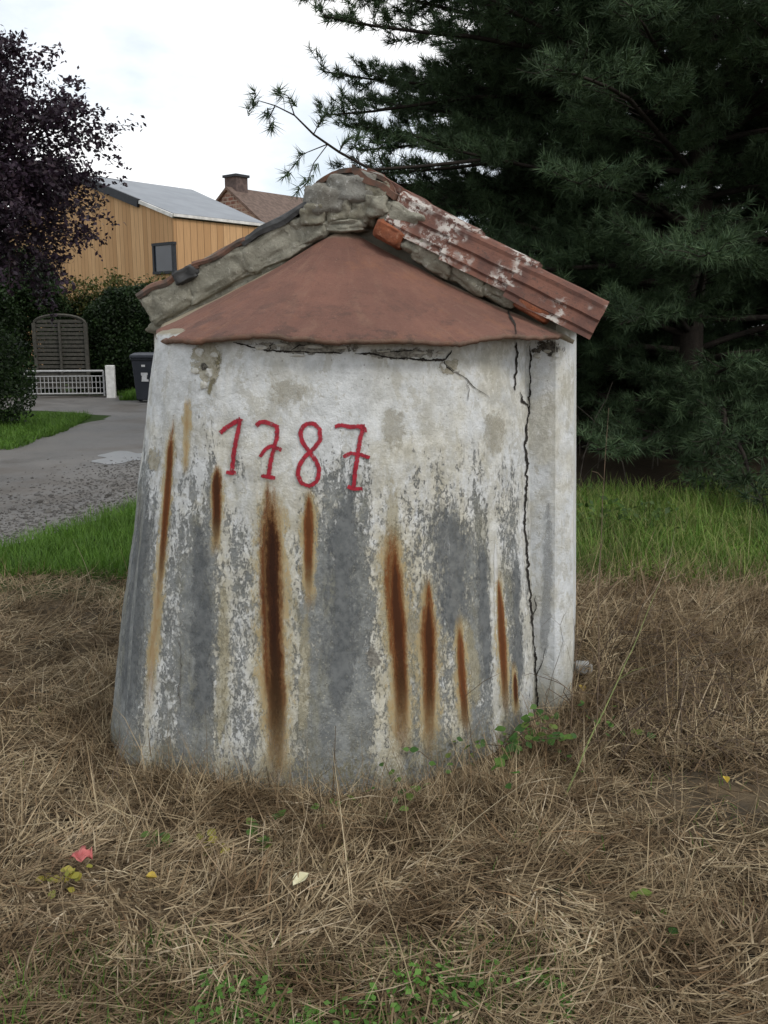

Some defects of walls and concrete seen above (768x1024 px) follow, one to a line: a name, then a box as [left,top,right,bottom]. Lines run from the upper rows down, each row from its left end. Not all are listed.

spalling [352,164,431,204]
spalling [191,342,221,390]
crack [233,342,485,397]
rust [146,402,192,680]
rust [210,468,225,545]
rust [251,487,318,766]
damp [322,478,362,715]
rust [377,536,443,738]
rust [453,623,471,721]
damp [429,501,524,688]
rust [494,581,520,711]
crack [508,310,546,708]